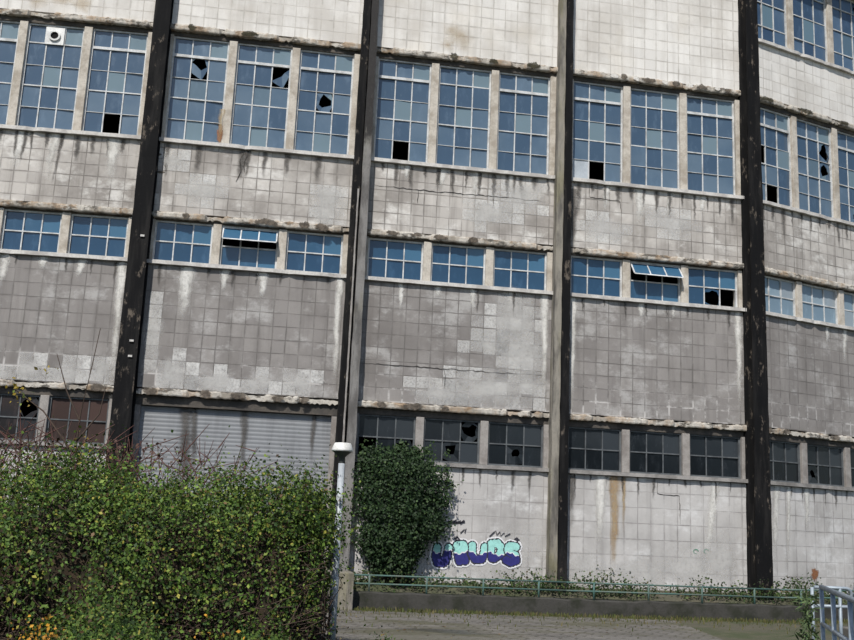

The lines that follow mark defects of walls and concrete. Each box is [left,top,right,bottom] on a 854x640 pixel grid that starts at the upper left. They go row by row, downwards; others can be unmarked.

spalling [610,73,732,92]
leakage [14,130,33,157]
leakage [45,133,64,165]
leakage [107,138,125,173]
leakage [239,150,251,173]
leakage [424,167,454,190]
leakage [465,171,536,193]
leakage [180,267,193,307]
leakage [256,272,267,292]
leakage [113,262,127,352]
leakage [327,278,343,367]
rust [610,476,626,544]